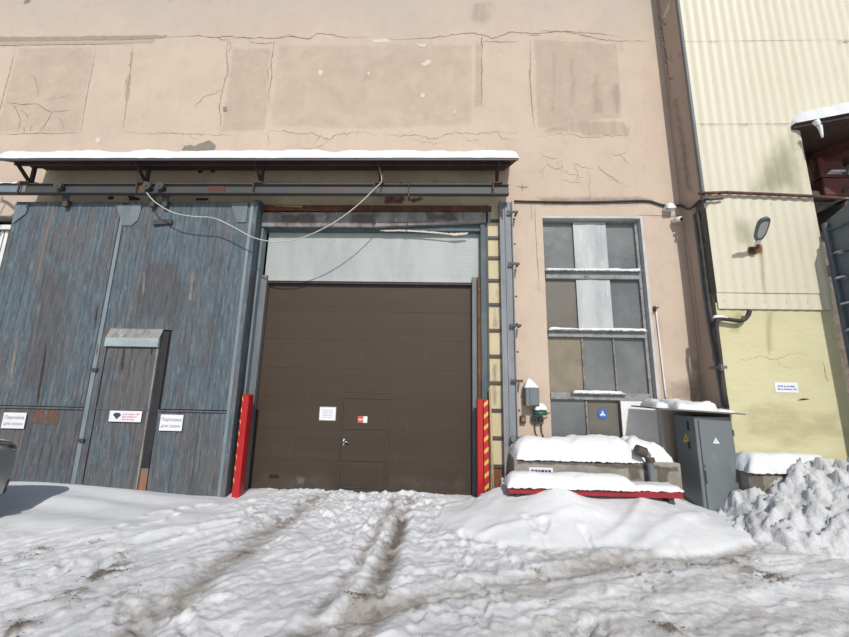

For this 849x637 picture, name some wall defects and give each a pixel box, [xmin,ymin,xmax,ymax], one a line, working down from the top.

crack [0,44,108,135]
spalling [182,141,215,151]
crack [163,33,366,139]
crack [268,0,674,277]